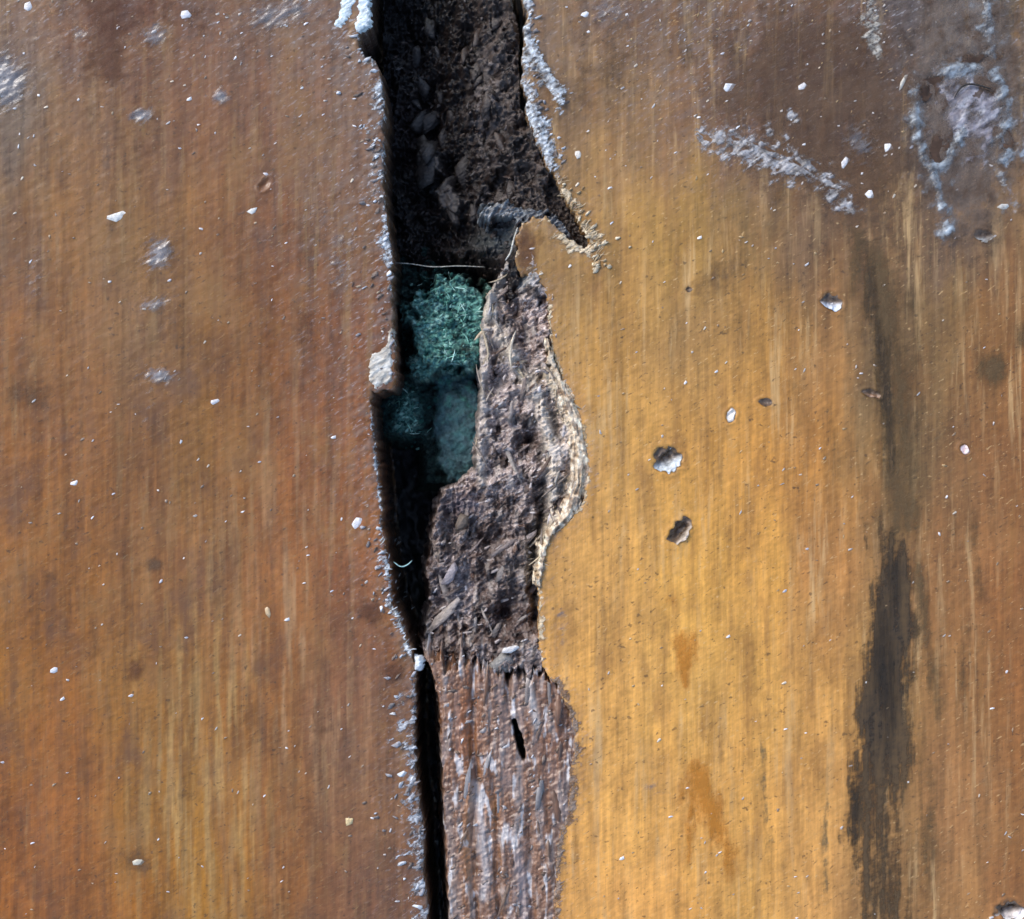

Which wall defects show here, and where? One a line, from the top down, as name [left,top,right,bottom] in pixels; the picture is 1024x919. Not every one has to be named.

peeling [334,0,394,299]
crack [377,58,385,76]
crack [514,159,588,249]
crack [393,448,438,619]
spalling [360,255,590,919]
leakage [823,233,930,919]
crack [428,675,444,919]
crack [514,718,524,751]